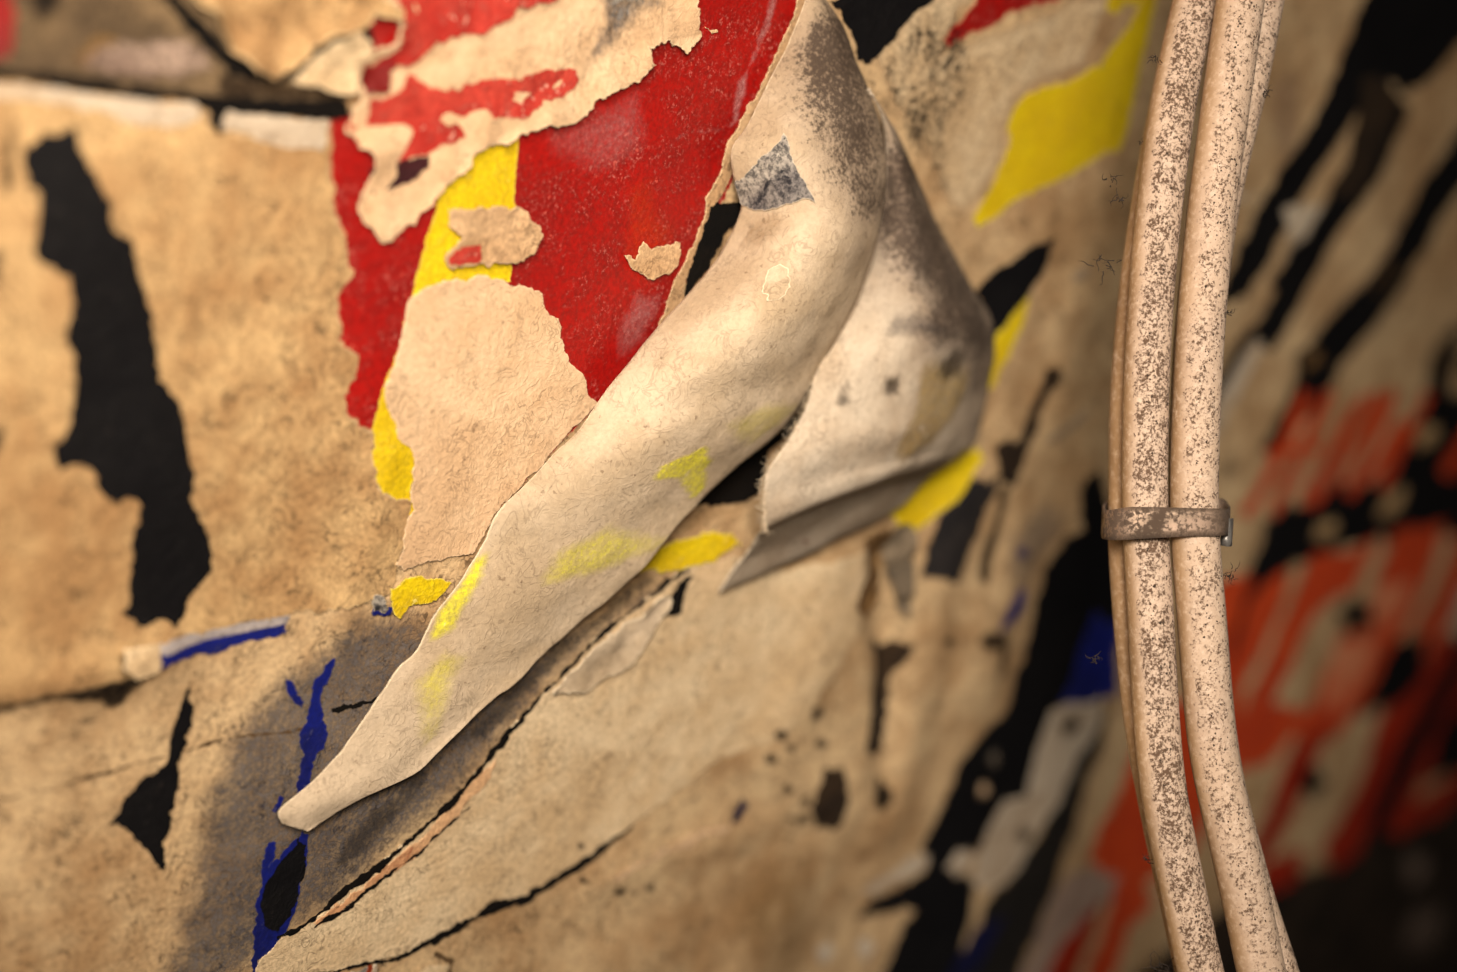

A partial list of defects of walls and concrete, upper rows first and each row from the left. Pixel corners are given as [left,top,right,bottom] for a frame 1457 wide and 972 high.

peeling [278,0,995,831]
crack [0,697,377,802]
crack [323,826,633,972]
crack [277,569,693,939]